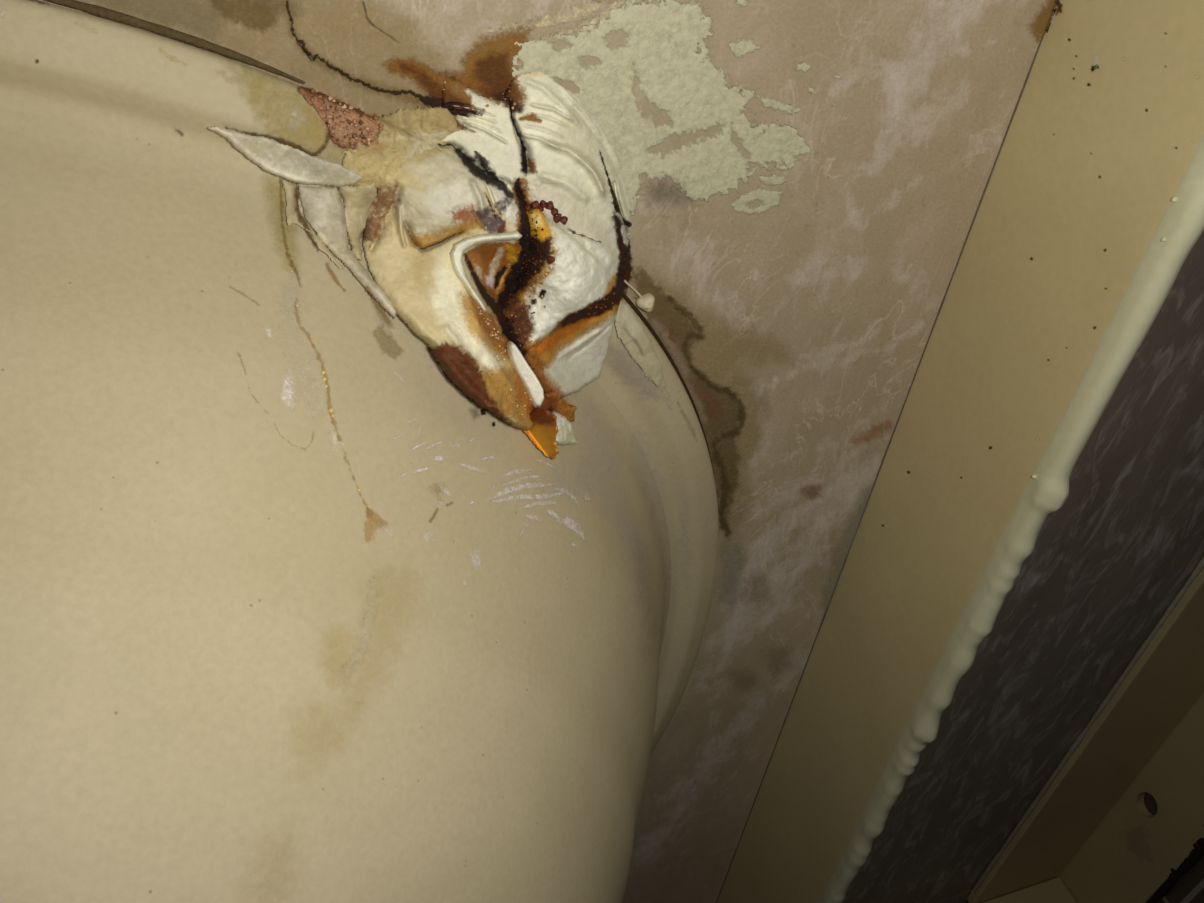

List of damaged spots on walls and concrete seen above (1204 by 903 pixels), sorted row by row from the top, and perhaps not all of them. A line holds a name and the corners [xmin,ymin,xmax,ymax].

water stain [99,0,433,118]
spalling [298,86,384,149]
crack [286,1,432,107]
corrosion [387,29,542,132]
peeling [729,39,760,57]
corrosion [361,185,399,247]
peeling [731,174,789,215]
crack [280,179,408,503]
corrosion [407,195,632,428]
water stain [632,272,761,536]